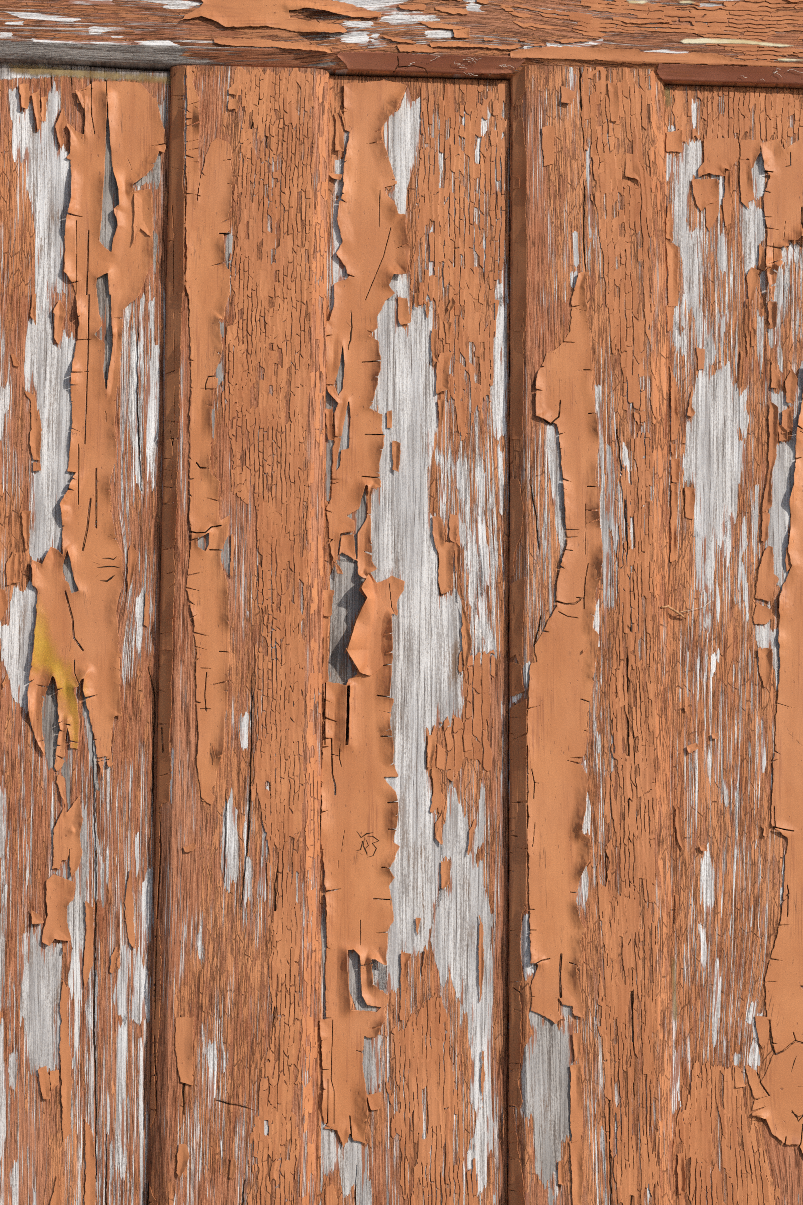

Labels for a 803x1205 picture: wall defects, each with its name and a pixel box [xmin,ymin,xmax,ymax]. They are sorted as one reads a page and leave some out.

peeling [0,0,180,46]
peeling [0,66,269,1205]
peeling [319,79,494,1205]
peeling [475,107,633,1205]
crack [499,0,803,1205]
peeling [665,99,803,1153]